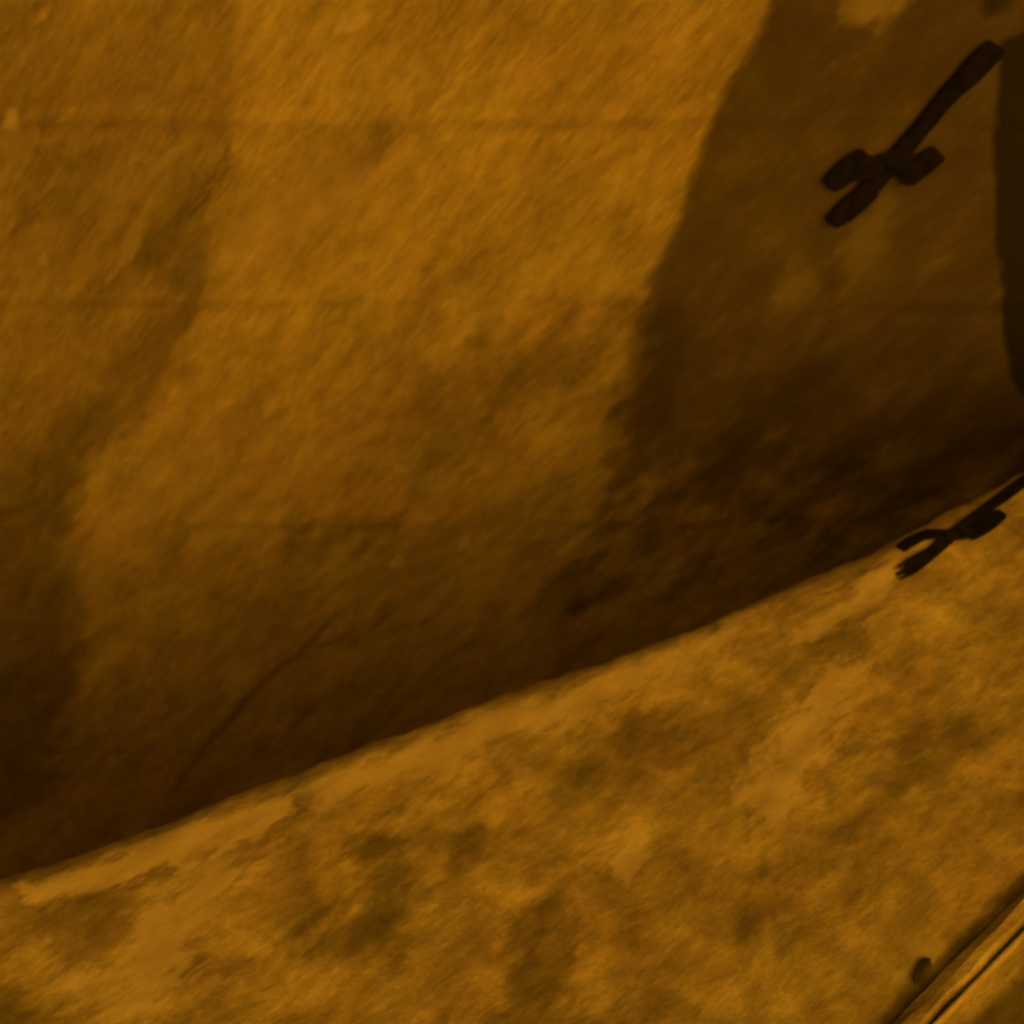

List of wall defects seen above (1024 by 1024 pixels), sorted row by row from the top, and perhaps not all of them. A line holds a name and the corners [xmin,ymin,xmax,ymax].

crack [172,607,356,797]